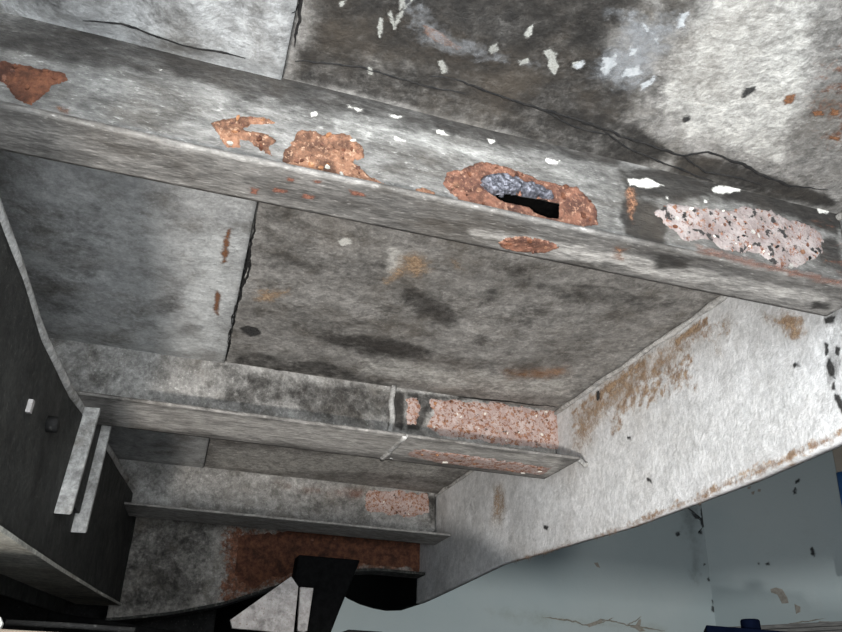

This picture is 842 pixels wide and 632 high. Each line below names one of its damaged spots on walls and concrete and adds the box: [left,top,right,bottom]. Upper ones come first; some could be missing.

crack [83,20,245,59]
crack [292,0,828,190]
corrosion [211,115,276,156]
corrosion [282,130,384,184]
peeling [480,173,554,200]
corrosion [627,188,637,218]
corrosion [221,229,230,263]
corrosion [498,236,559,254]
crack [225,219,256,361]
corrosion [579,320,700,440]
crack [543,617,665,631]